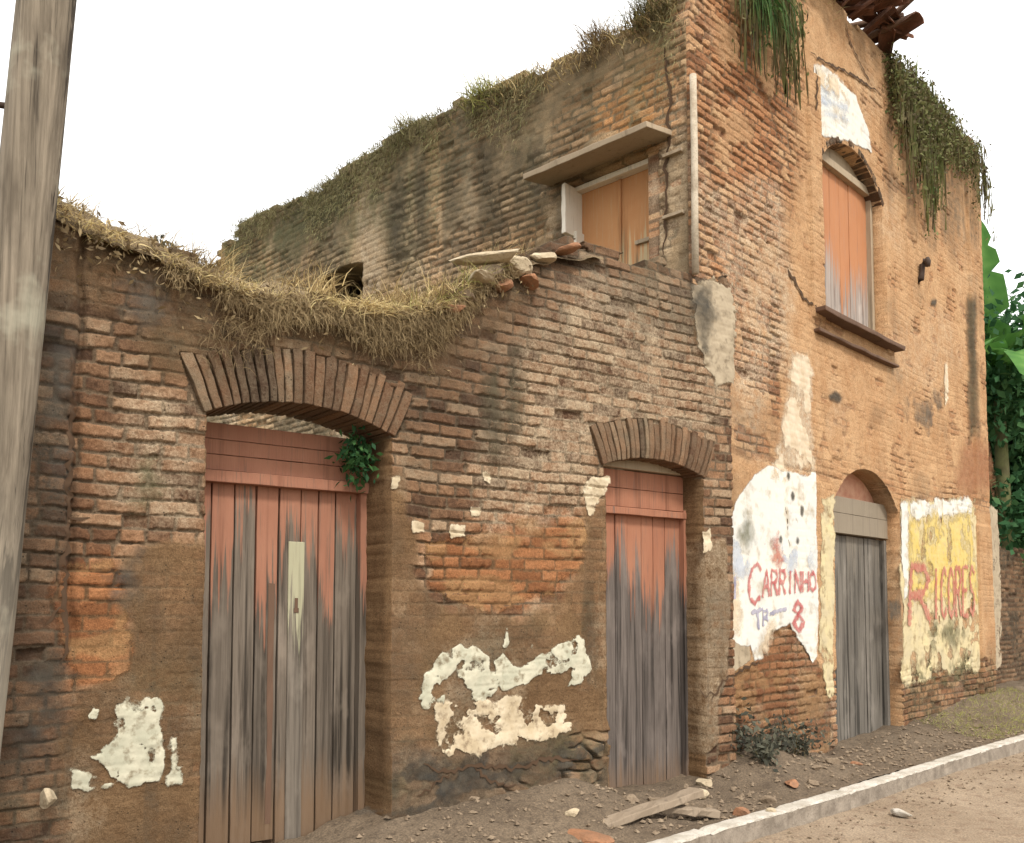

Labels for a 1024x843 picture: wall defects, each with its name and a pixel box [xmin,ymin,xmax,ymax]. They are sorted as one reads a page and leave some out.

crack [662,47,673,255]
peeling [814,64,872,152]
crack [787,268,817,307]
spalling [412,475,611,615]
peeling [731,465,835,754]
peeling [890,497,980,688]
peeling [70,697,183,792]
peeling [419,632,592,757]